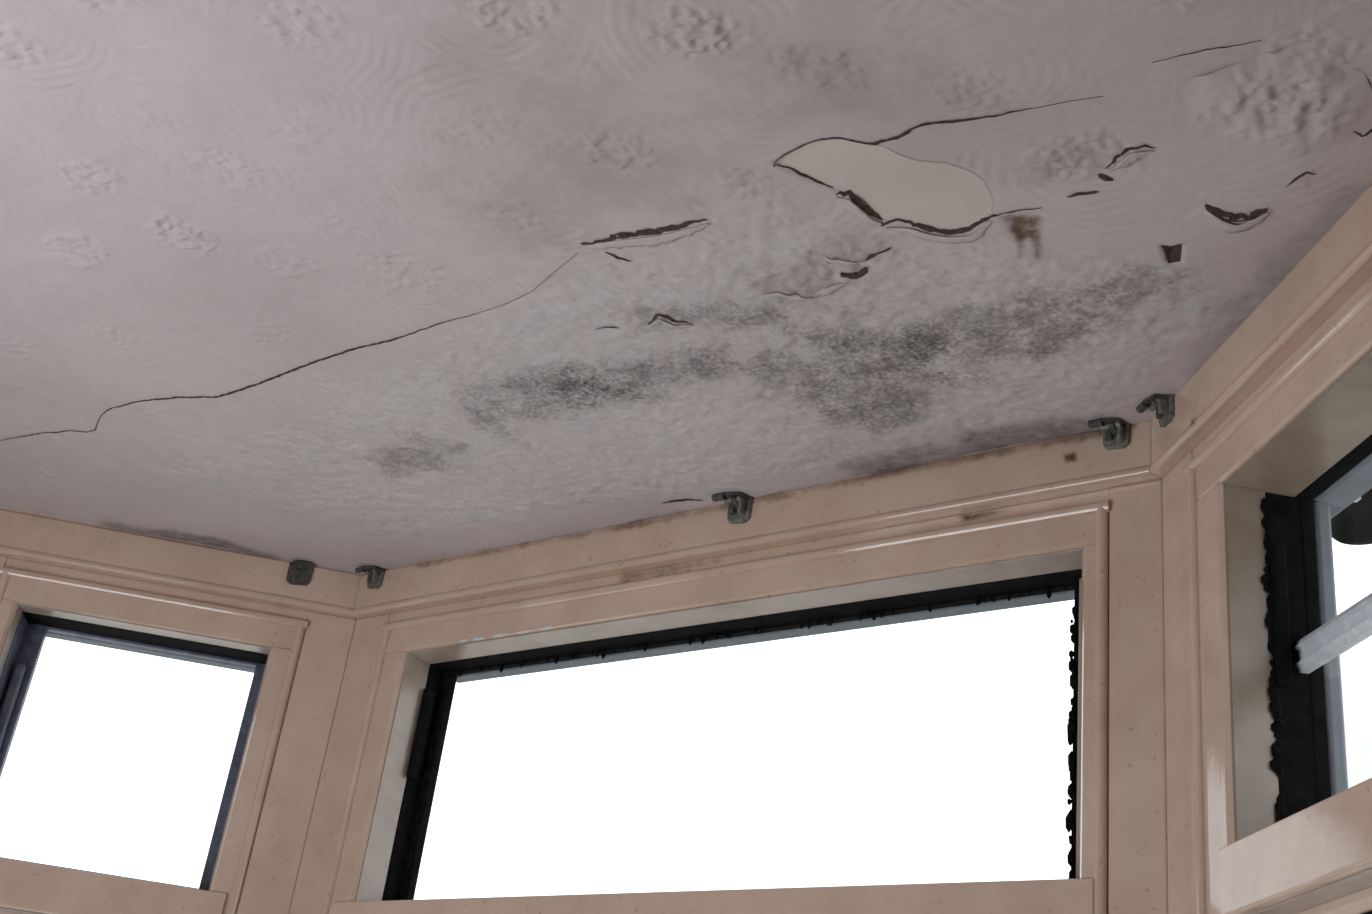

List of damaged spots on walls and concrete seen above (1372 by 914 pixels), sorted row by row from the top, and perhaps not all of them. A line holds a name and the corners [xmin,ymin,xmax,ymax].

flaking render [775,139,994,244]
flaking render [1203,209,1270,234]
crack [0,219,707,441]